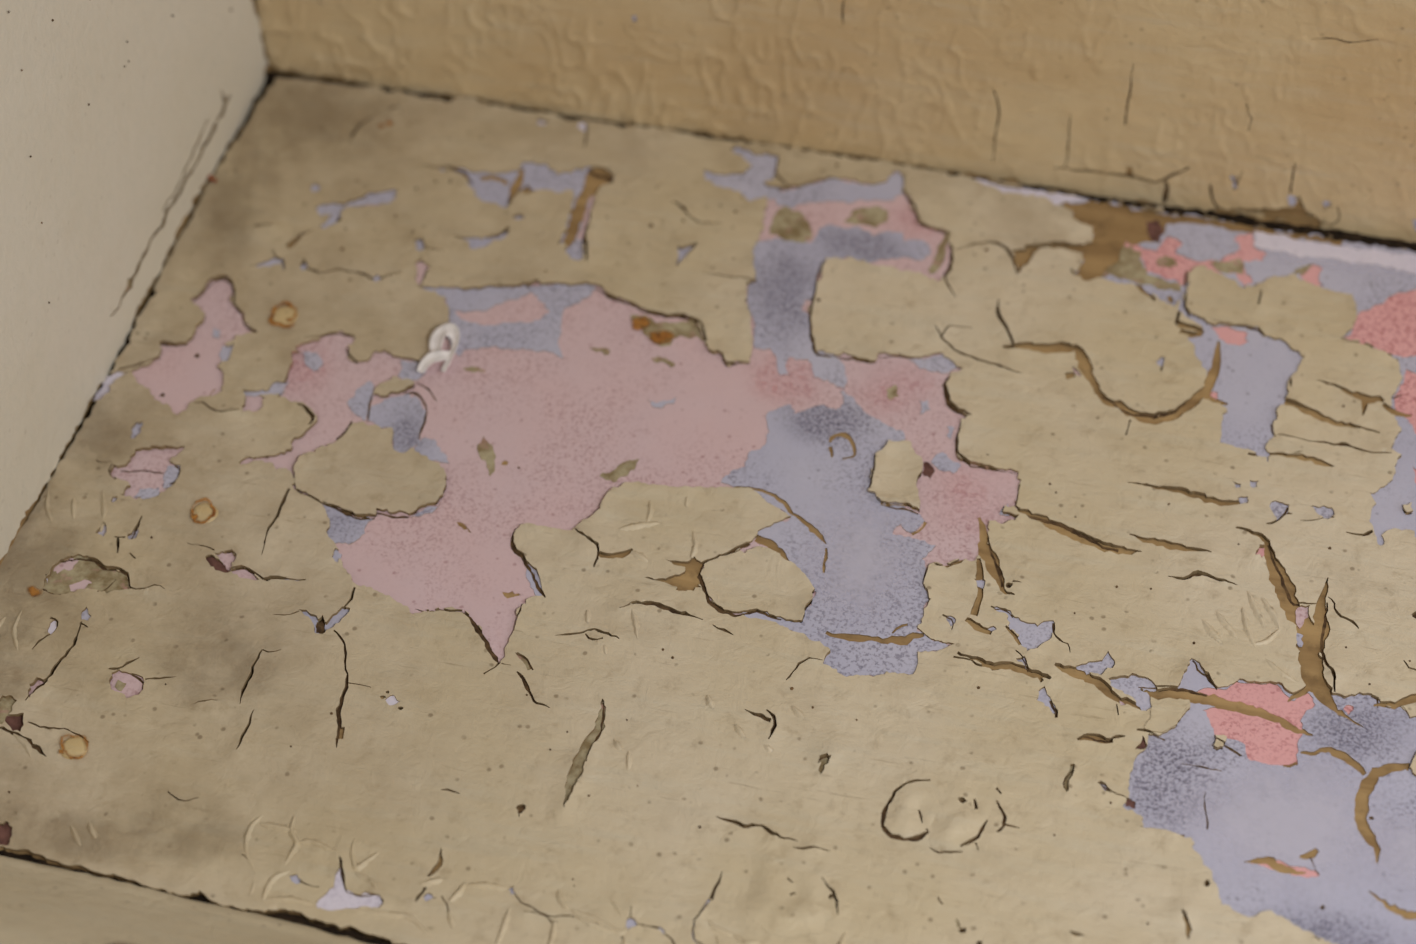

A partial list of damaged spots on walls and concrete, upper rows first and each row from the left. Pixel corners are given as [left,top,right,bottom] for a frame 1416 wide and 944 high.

peeling [109,422,184,502]
peeling [93,278,256,415]
peeling [240,147,1021,677]
peeling [974,162,1416,546]
crack [0,609,91,756]
crack [0,850,139,886]
peeling [43,518,142,595]
crack [267,912,391,944]
crack [336,634,349,748]
crack [564,700,606,805]
crack [923,485,1416,744]
peeling [1123,659,1416,944]